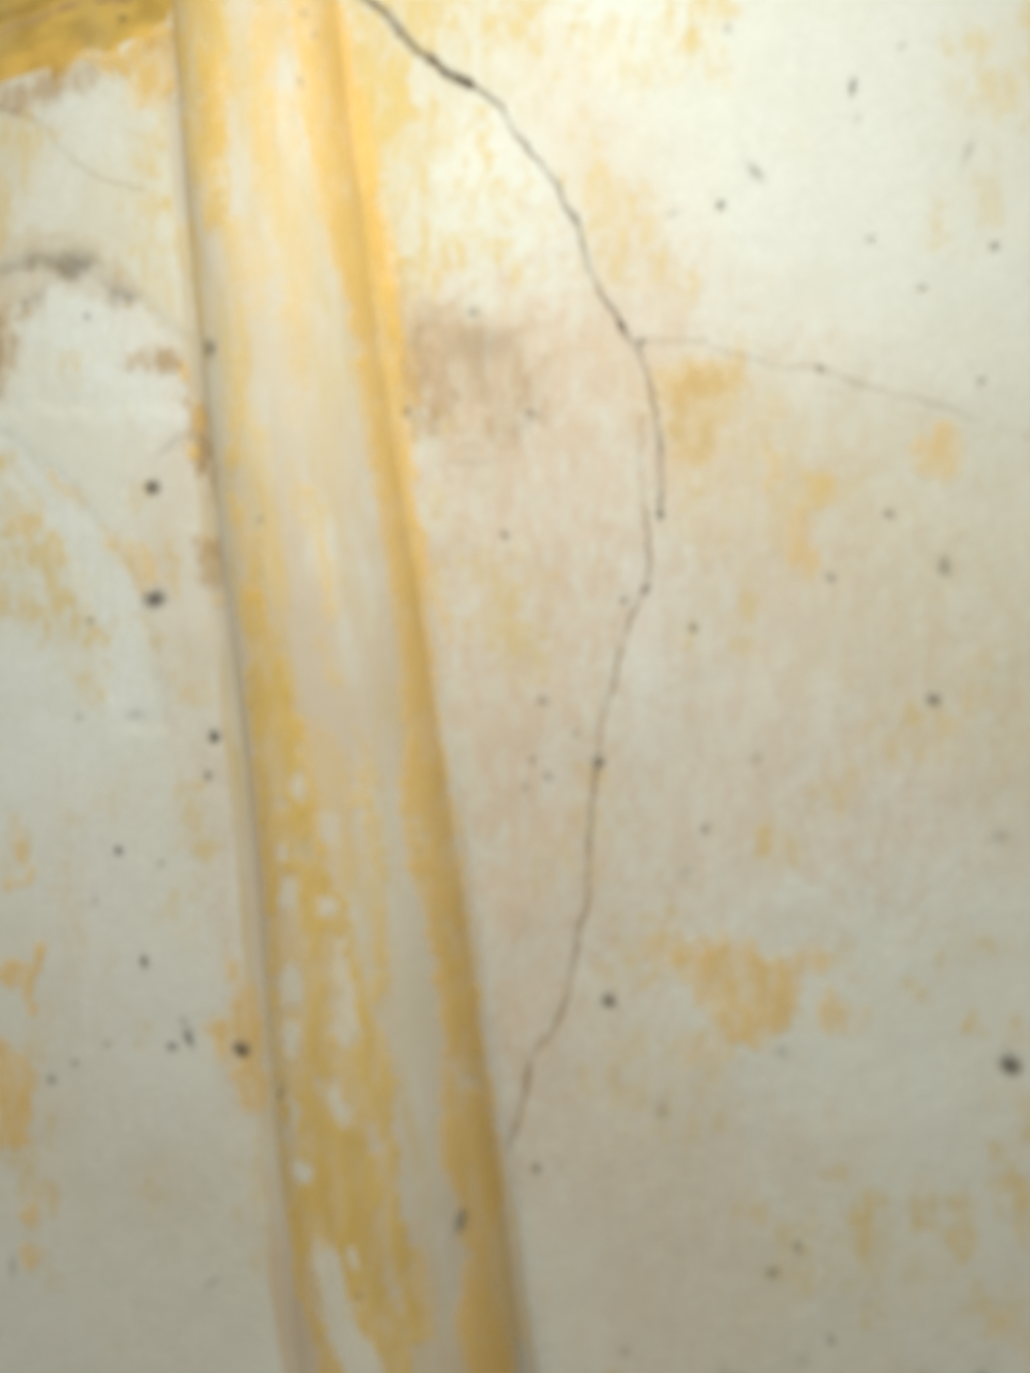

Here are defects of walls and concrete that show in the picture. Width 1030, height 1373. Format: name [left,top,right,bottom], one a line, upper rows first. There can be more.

crack [370,0,471,87]